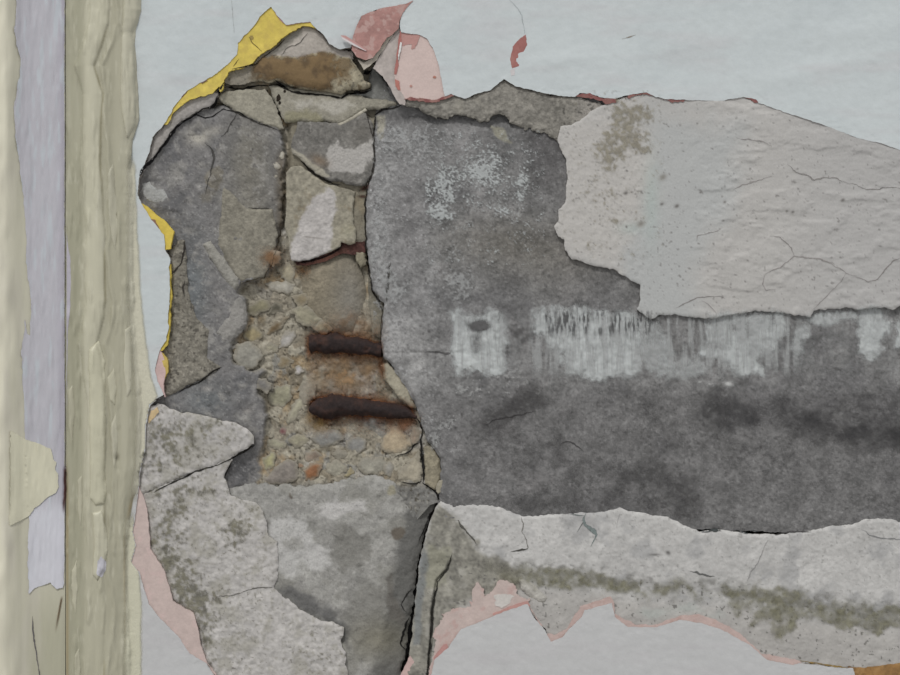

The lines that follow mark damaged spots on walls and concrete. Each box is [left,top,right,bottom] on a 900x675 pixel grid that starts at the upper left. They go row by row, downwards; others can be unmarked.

crack [139,33,402,344]
efflorescence [425,140,533,220]
peeling [9,0,71,593]
crack [155,367,222,400]
spalling [131,7,443,675]
rust [307,331,415,430]
flaking render [254,1,900,675]
leakage [534,307,650,381]
leakage [700,308,900,375]
crack [155,445,255,492]
crack [394,418,452,675]
mould [723,585,900,637]